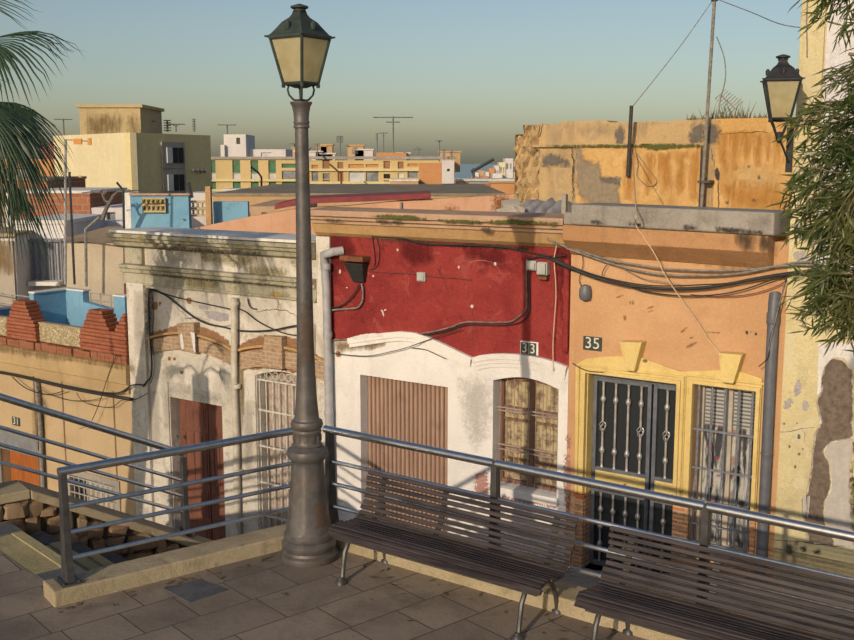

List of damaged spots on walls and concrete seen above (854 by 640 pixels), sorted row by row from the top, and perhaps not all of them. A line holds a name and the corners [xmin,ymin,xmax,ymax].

leakage [689,124,721,144]
flaking render [151,298,268,361]
flaking render [784,342,854,547]
crack [772,539,851,555]